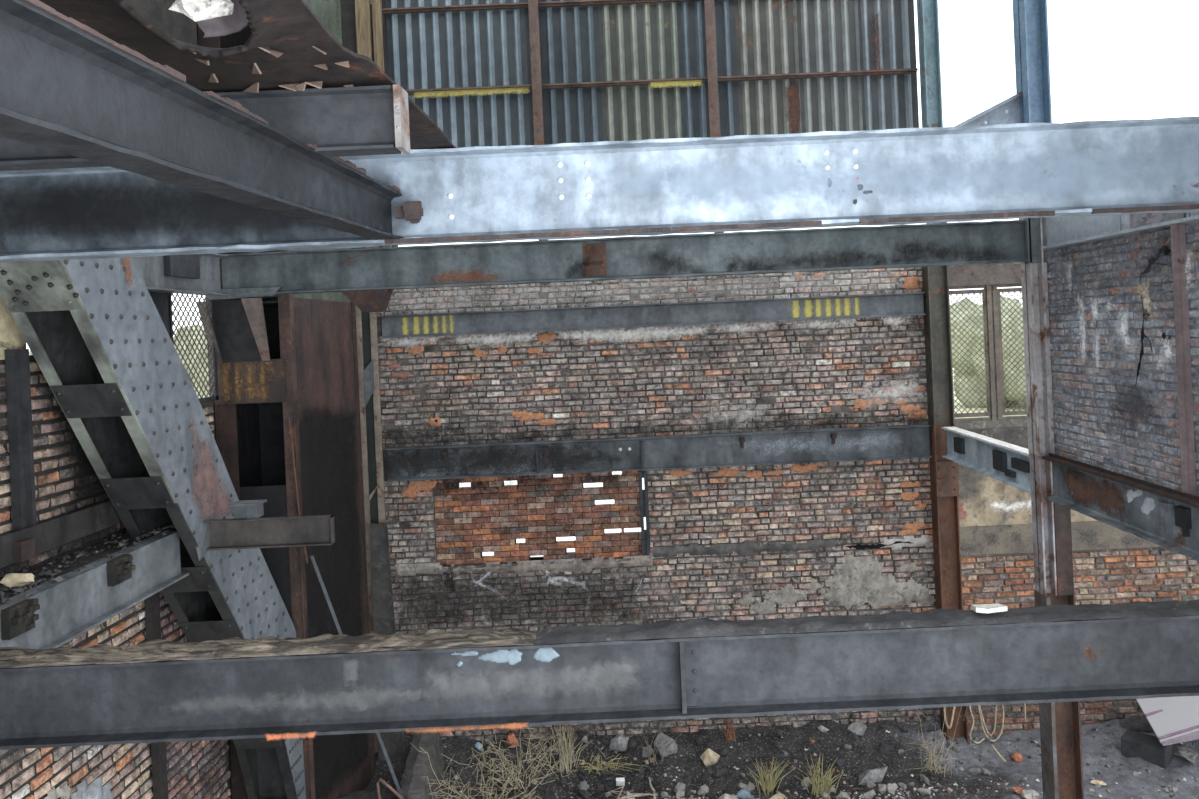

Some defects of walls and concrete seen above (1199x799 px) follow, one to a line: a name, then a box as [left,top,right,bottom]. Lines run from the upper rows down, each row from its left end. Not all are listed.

corrosion [786,84,800,133]
crack [1135,245,1171,386]
spalling [881,481,931,550]
corrosion [1064,471,1126,517]
flaking render [393,537,936,615]
flaking render [45,776,113,799]